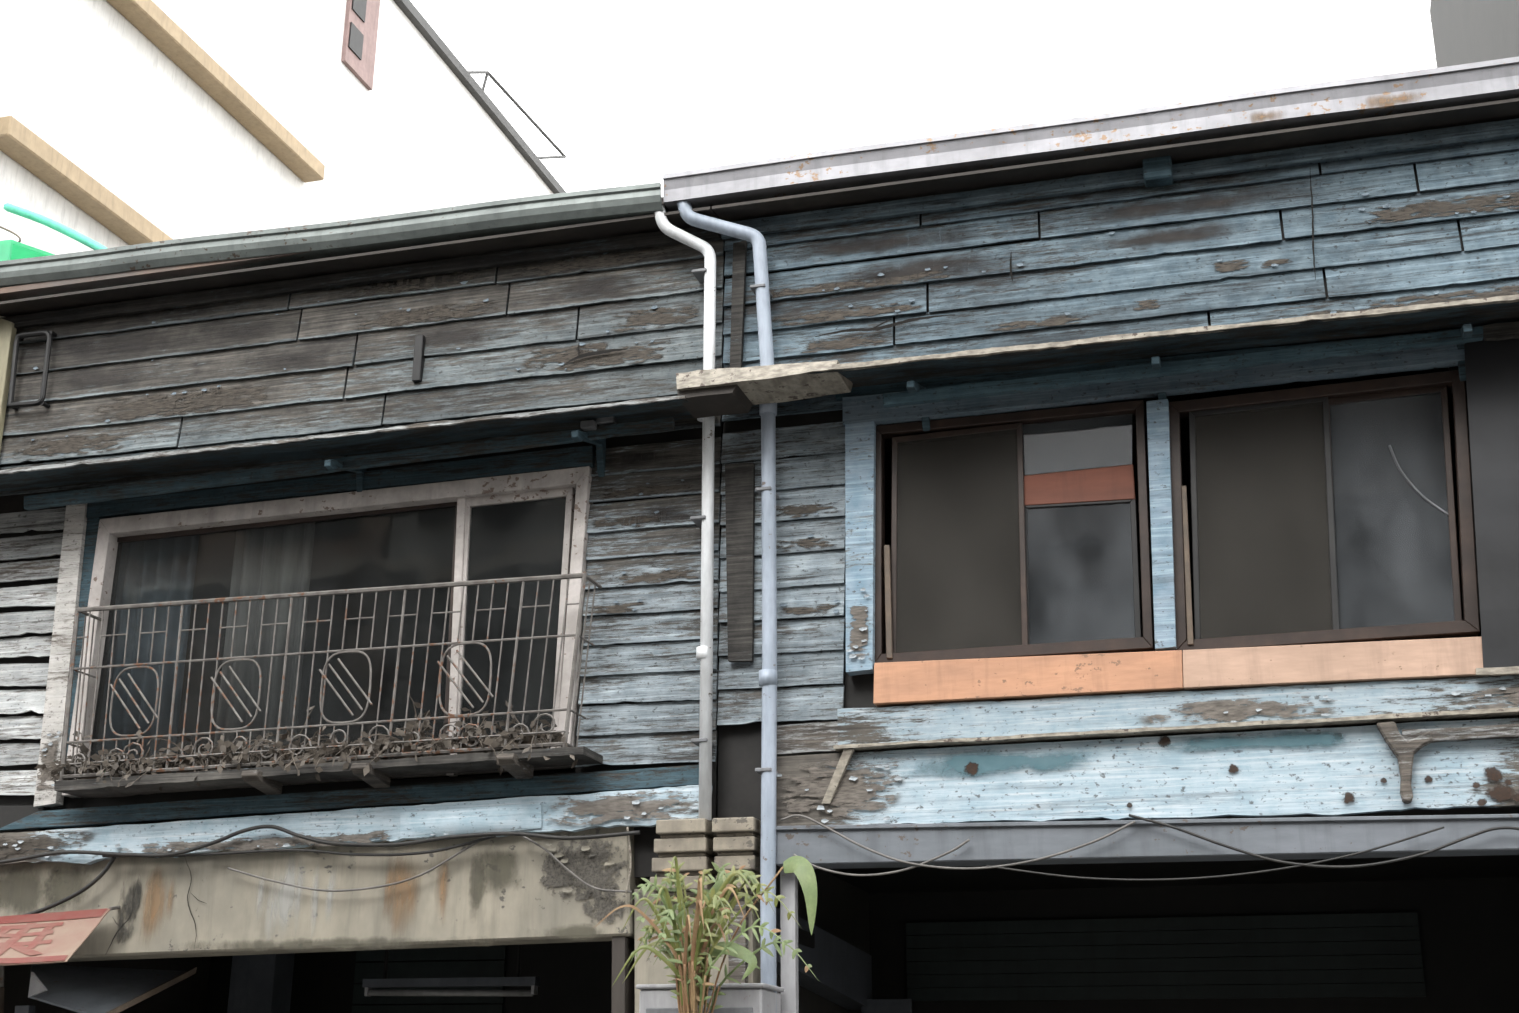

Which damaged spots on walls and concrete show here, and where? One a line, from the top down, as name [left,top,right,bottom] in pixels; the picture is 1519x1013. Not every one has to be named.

peeling [1358,191,1519,223]
peeling [1214,258,1289,273]
peeling [1304,285,1519,316]
peeling [989,312,1085,332]
peeling [1141,695,1333,728]
peeling [777,758,902,823]
rust [1473,767,1519,806]
water stain [0,870,83,912]
water stain [470,854,514,906]
water stain [117,882,141,942]
water stain [224,938,407,950]
water stain [556,925,596,939]